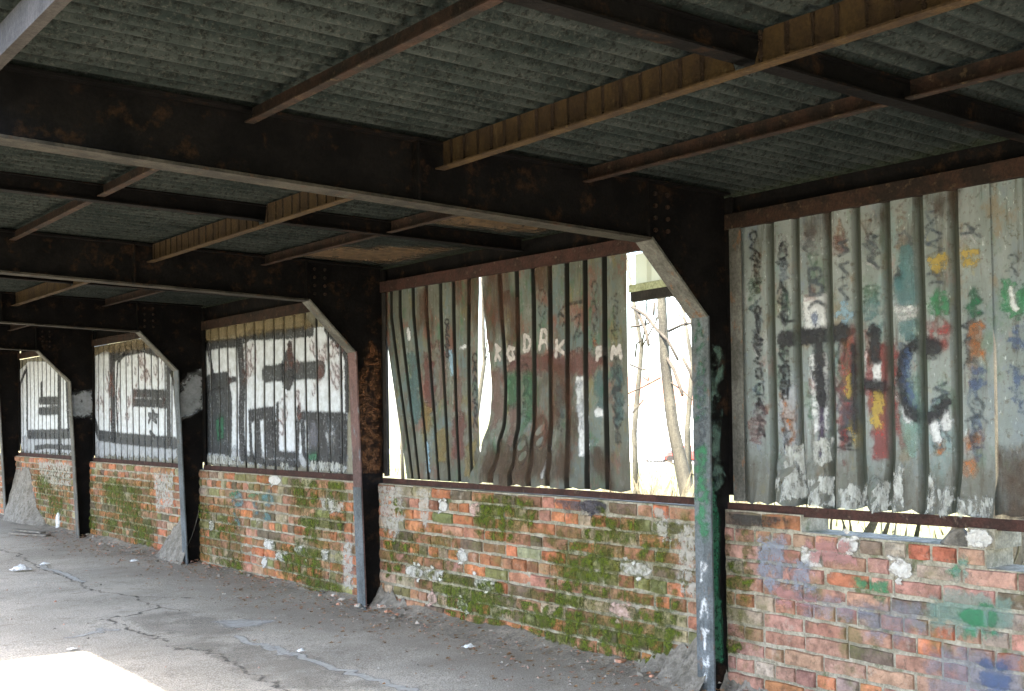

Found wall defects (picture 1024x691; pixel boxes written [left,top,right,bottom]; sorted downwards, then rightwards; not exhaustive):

corrosion [436,216,544,232]
corrosion [358,341,383,473]
efflorescence [154,471,174,509]
efflorescence [321,498,343,513]
efflorescence [378,486,405,540]
efflorescence [416,489,429,527]
leakage [555,500,599,515]
efflorescence [343,541,354,589]
efflorescence [654,507,696,597]
spalling [837,528,859,555]
spalling [887,555,912,585]
crack [8,552,419,691]